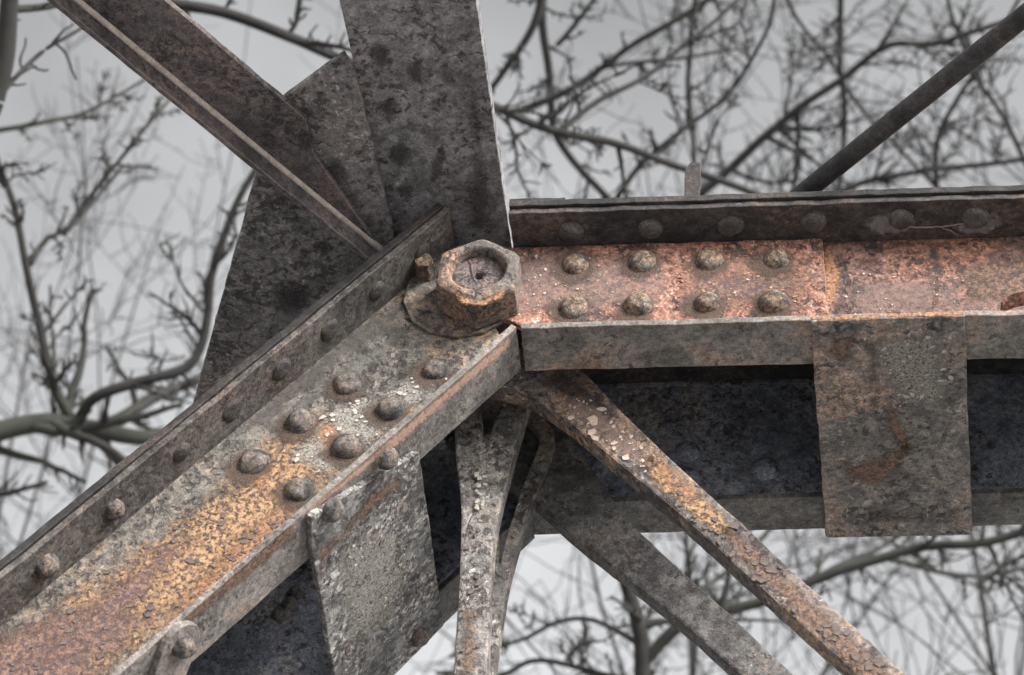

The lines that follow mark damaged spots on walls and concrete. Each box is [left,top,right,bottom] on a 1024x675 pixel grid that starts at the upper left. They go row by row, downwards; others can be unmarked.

corrosion [460,291,504,305]
corrosion [670,252,812,319]
corrosion [812,250,965,320]
corrosion [960,258,1024,311]
corrosion [841,402,915,484]
corrosion [0,338,510,675]
corrosion [644,453,889,675]